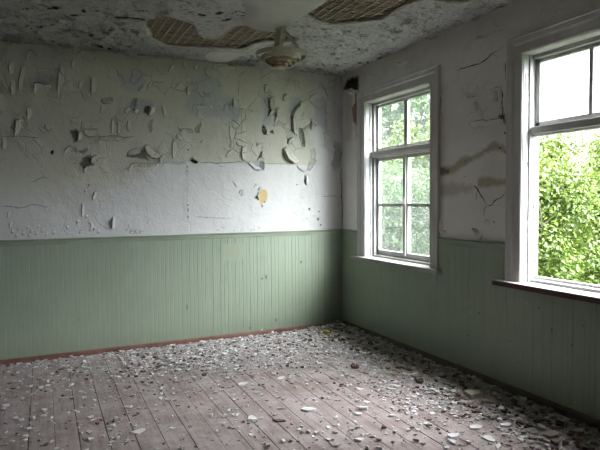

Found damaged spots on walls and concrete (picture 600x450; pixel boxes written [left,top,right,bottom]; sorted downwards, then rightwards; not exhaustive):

spalling [344,76,359,95]
crack [457,51,506,115]
peeling [64,130,100,173]
peeling [111,95,166,134]
peeling [127,144,161,159]
peeling [225,122,266,173]
peeling [256,84,343,185]
leakage [440,138,506,202]
flaking render [254,183,268,207]